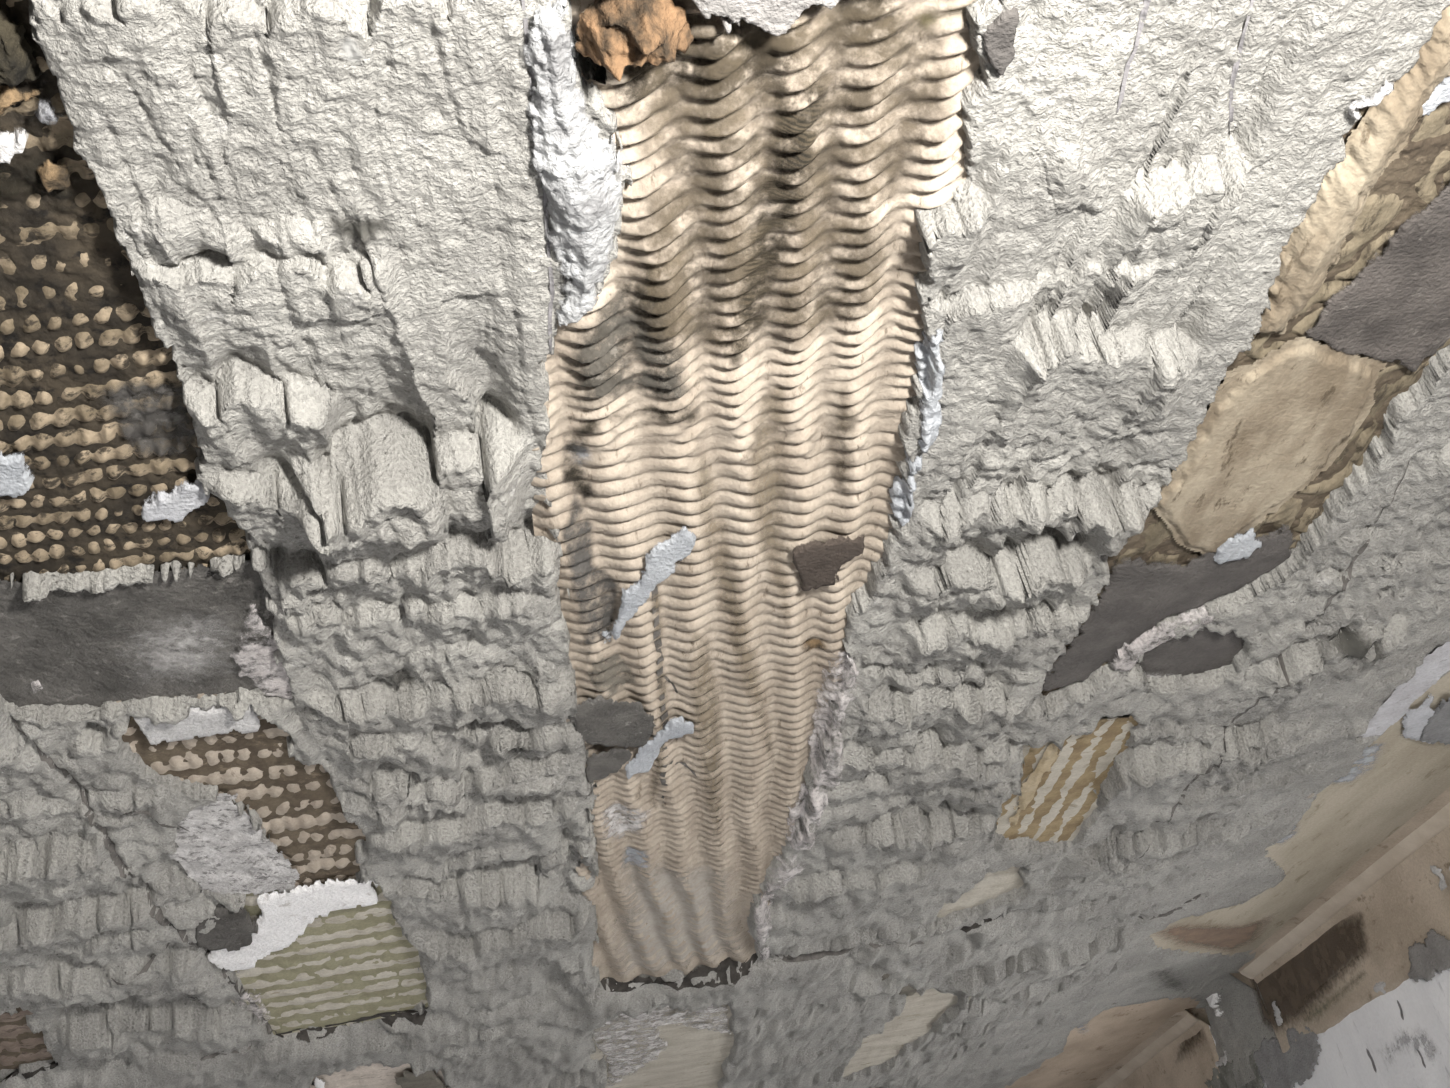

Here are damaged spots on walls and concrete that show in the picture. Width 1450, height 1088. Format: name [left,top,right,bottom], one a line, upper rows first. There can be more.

flaking render [1041,5,1450,696]
flaking render [0,0,429,1035]
flaking render [523,0,1024,983]
flaking render [995,715,1138,843]
flaking render [1149,642,1450,956]
crack [11,717,428,1061]
flaking render [0,1007,53,1070]
flaking render [310,1063,449,1088]
flaking render [590,1003,734,1088]
flaking render [843,984,972,1077]
flaking render [1205,1025,1322,1088]